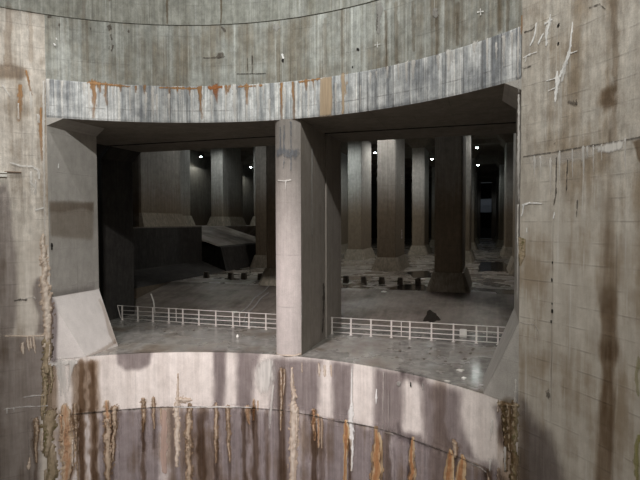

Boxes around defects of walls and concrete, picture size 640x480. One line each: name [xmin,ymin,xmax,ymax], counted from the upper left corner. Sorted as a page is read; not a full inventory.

leakage [530,14,552,46]
rust [17,70,30,112]
rust [87,79,146,109]
rust [159,83,262,110]
rust [292,76,332,116]
leakage [4,233,81,480]
leakage [102,400,119,480]
leakage [140,395,163,433]
leakage [172,373,234,480]
leakage [255,353,303,480]
leakage [340,369,358,480]
leakage [485,400,521,480]